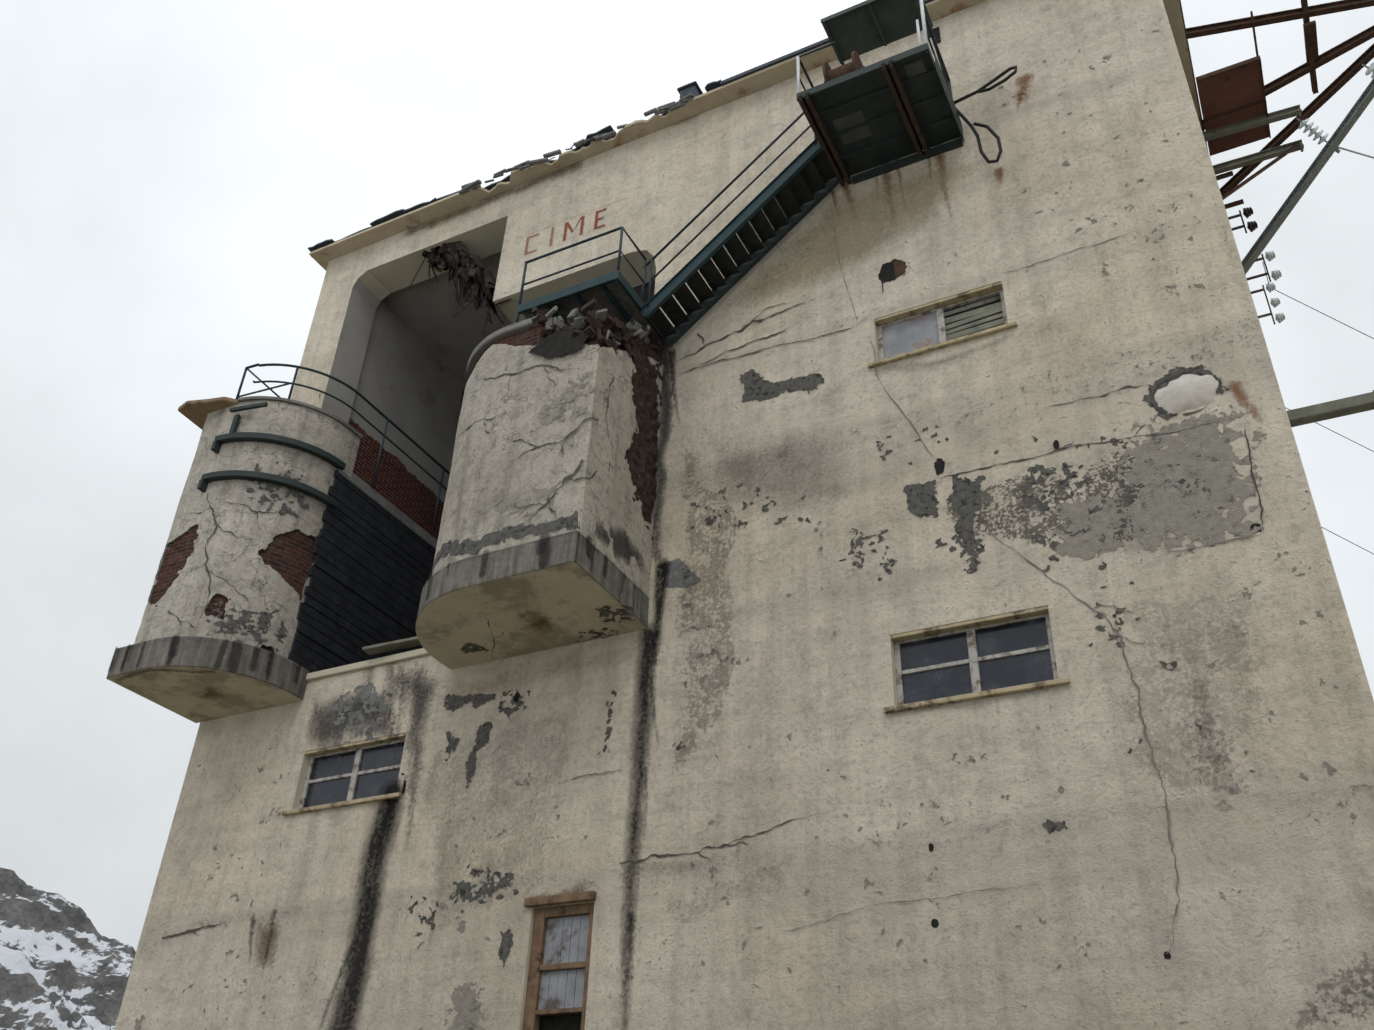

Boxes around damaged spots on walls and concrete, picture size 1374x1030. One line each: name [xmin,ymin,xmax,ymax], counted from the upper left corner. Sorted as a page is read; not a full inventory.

spalling [150,525,199,604]
crack [461,364,621,522]
damp [537,533,550,567]
spalling [619,324,663,541]
peeling [903,425,986,574]
crack [679,196,1264,552]
peeling [1019,364,1267,647]
damp [311,691,389,742]
damp [331,671,432,1030]
damp [587,525,669,964]
crack [619,813,823,864]
crack [989,530,1180,954]